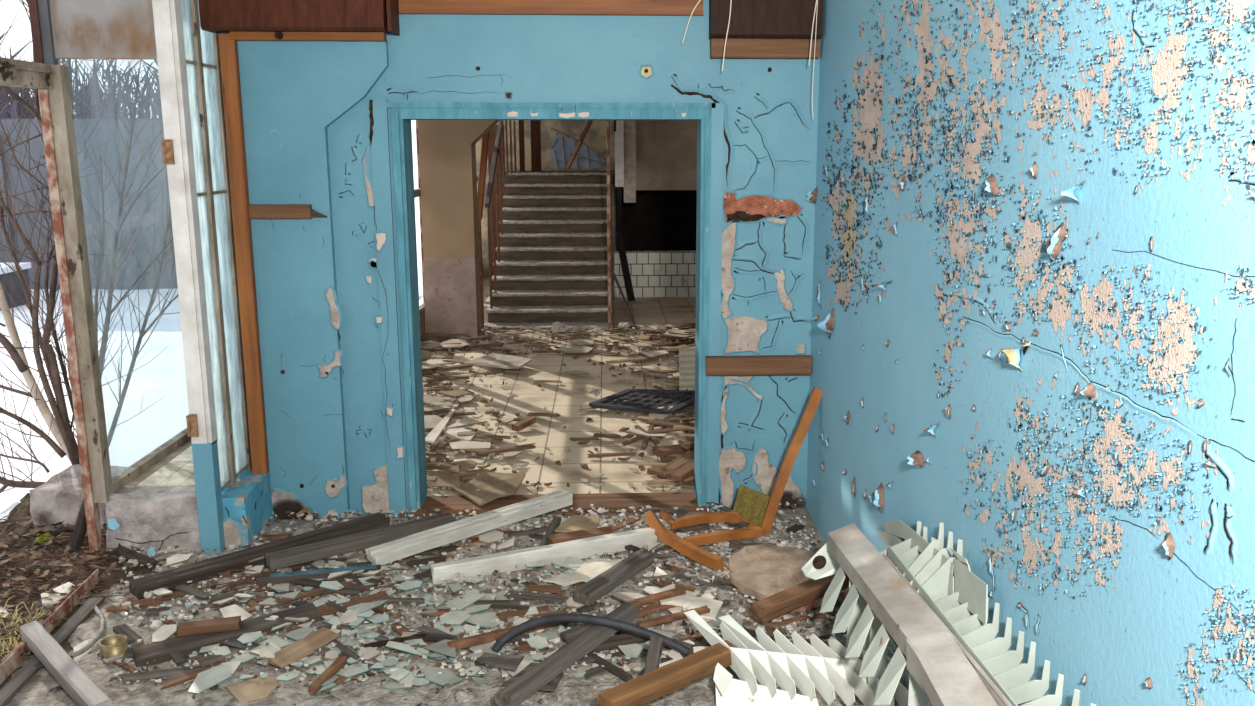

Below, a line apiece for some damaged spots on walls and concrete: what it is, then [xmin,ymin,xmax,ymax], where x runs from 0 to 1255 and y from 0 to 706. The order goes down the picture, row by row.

spalling [361,143,374,209]
spalling [324,284,343,331]
spalling [364,231,388,285]
crack [671,74,813,484]
peeling [719,0,1255,632]
crack [1116,250,1255,277]
spalling [315,348,343,379]
spalling [271,446,405,519]
crack [942,290,1255,635]
peeling [1177,580,1255,706]